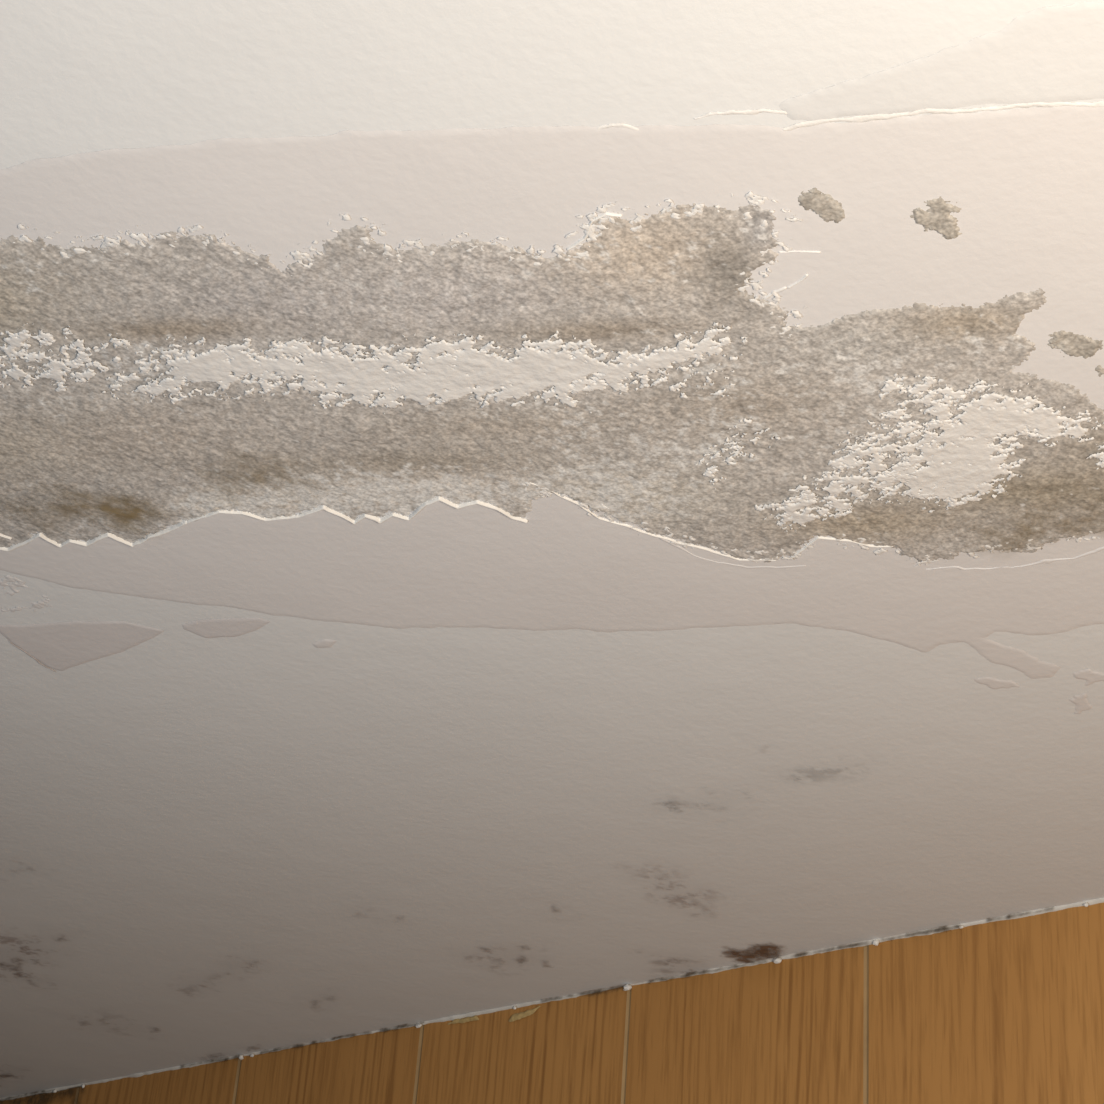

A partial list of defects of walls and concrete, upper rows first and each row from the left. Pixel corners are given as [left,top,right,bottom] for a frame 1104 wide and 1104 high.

spalling [0,106,1104,689]